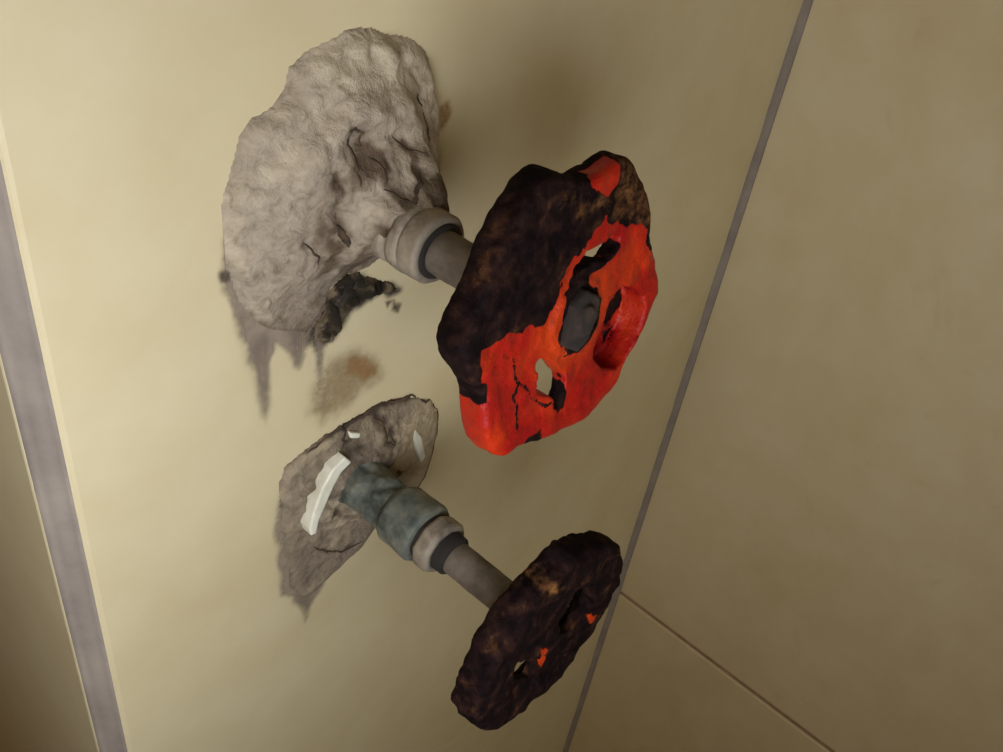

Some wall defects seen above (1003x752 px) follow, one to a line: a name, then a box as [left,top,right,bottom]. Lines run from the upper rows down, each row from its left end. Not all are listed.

leakage [222,245,328,392]
leakage [276,502,323,608]